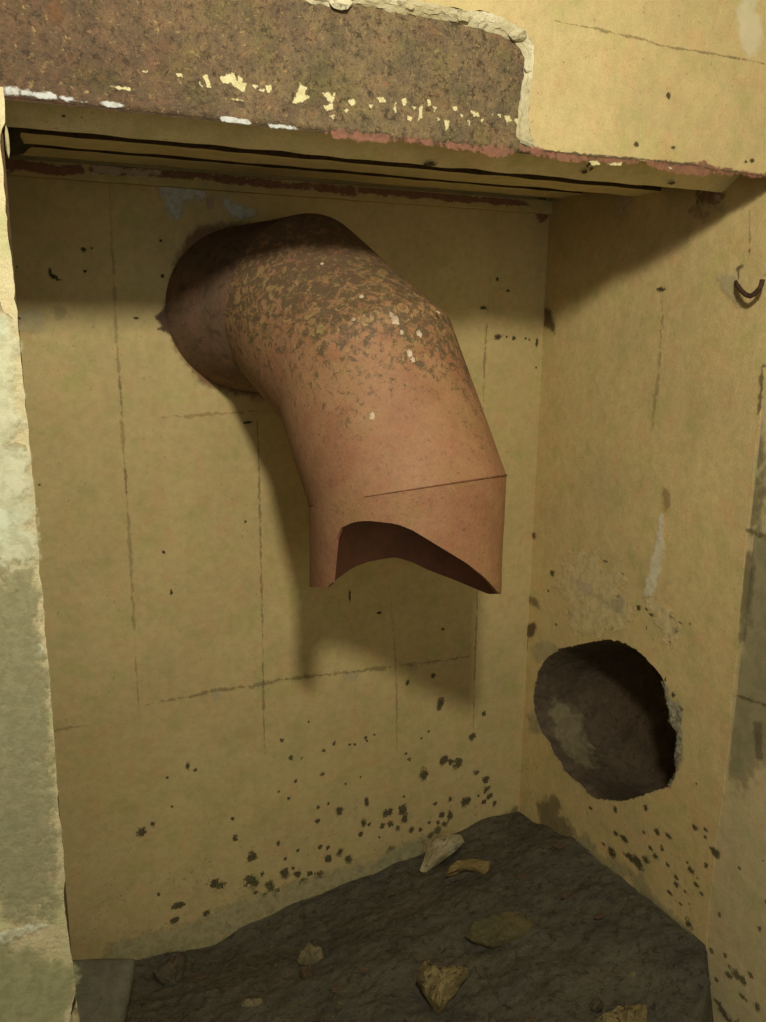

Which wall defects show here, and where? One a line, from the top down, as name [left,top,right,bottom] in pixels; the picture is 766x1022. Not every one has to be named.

peeling [5,87,72,101]
peeling [199,73,272,101]
peeling [221,116,251,124]
peeling [292,84,309,104]
flaking render [306,0,766,185]
rust [155,306,171,334]
efflorescence [644,515,664,595]
mould [439,755,463,770]
spalling [662,678,683,787]
leakage [105,771,497,960]
leakage [576,828,708,935]
mould [710,948,760,1012]